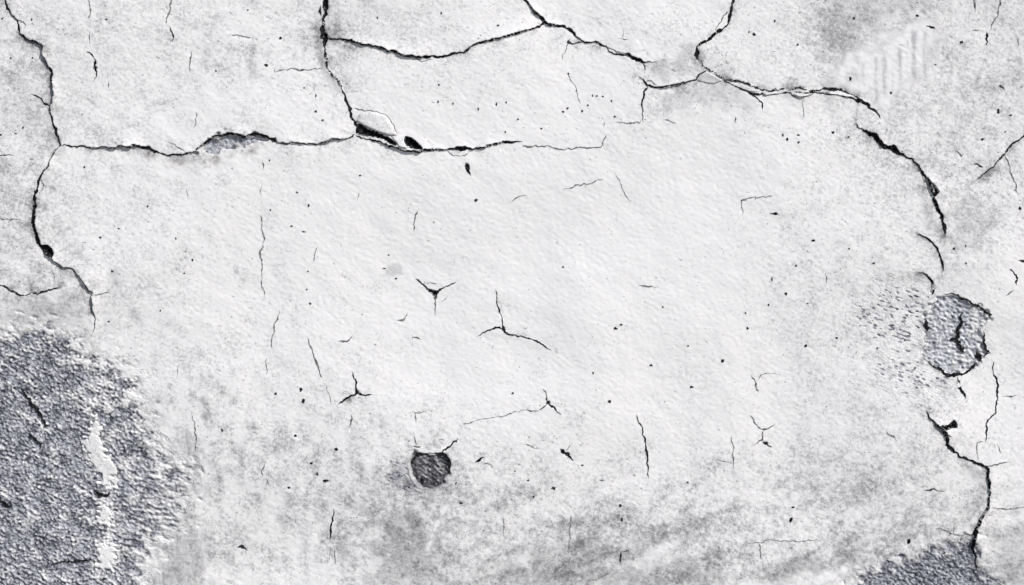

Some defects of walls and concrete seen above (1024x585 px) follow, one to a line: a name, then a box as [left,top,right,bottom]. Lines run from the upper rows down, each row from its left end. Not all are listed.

crack [971,0,1001,45]
crack [0,0,947,371]
peeling [922,293,992,377]
crack [308,339,372,426]
crack [463,389,559,424]
peeling [0,317,201,585]
spalling [411,437,458,488]
crack [927,362,1022,570]